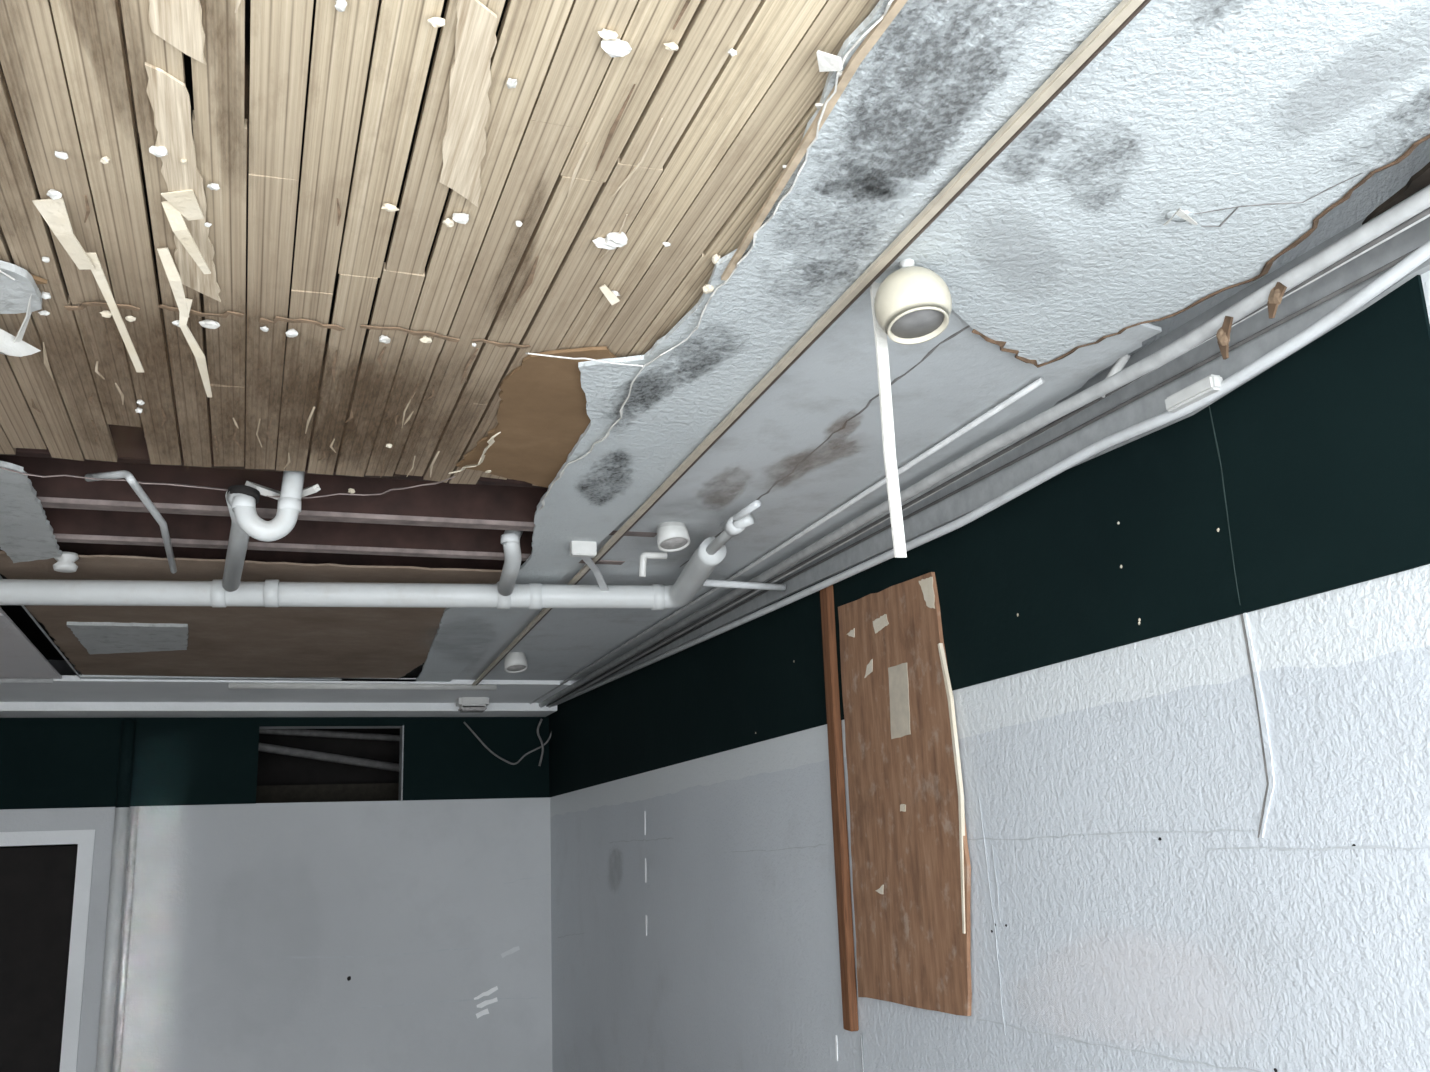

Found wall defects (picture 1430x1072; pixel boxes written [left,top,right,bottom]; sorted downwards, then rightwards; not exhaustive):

leakage [75,0,146,97]
leakage [903,38,956,88]
peeling [0,288,51,357]
peeling [32,189,144,372]
leakage [66,315,264,456]
peeling [157,183,220,397]
peeling [260,326,298,337]
peeling [443,213,469,227]
peeling [525,0,894,511]
leakage [810,93,984,288]
spalling [972,134,1430,368]
peeling [302,432,501,498]